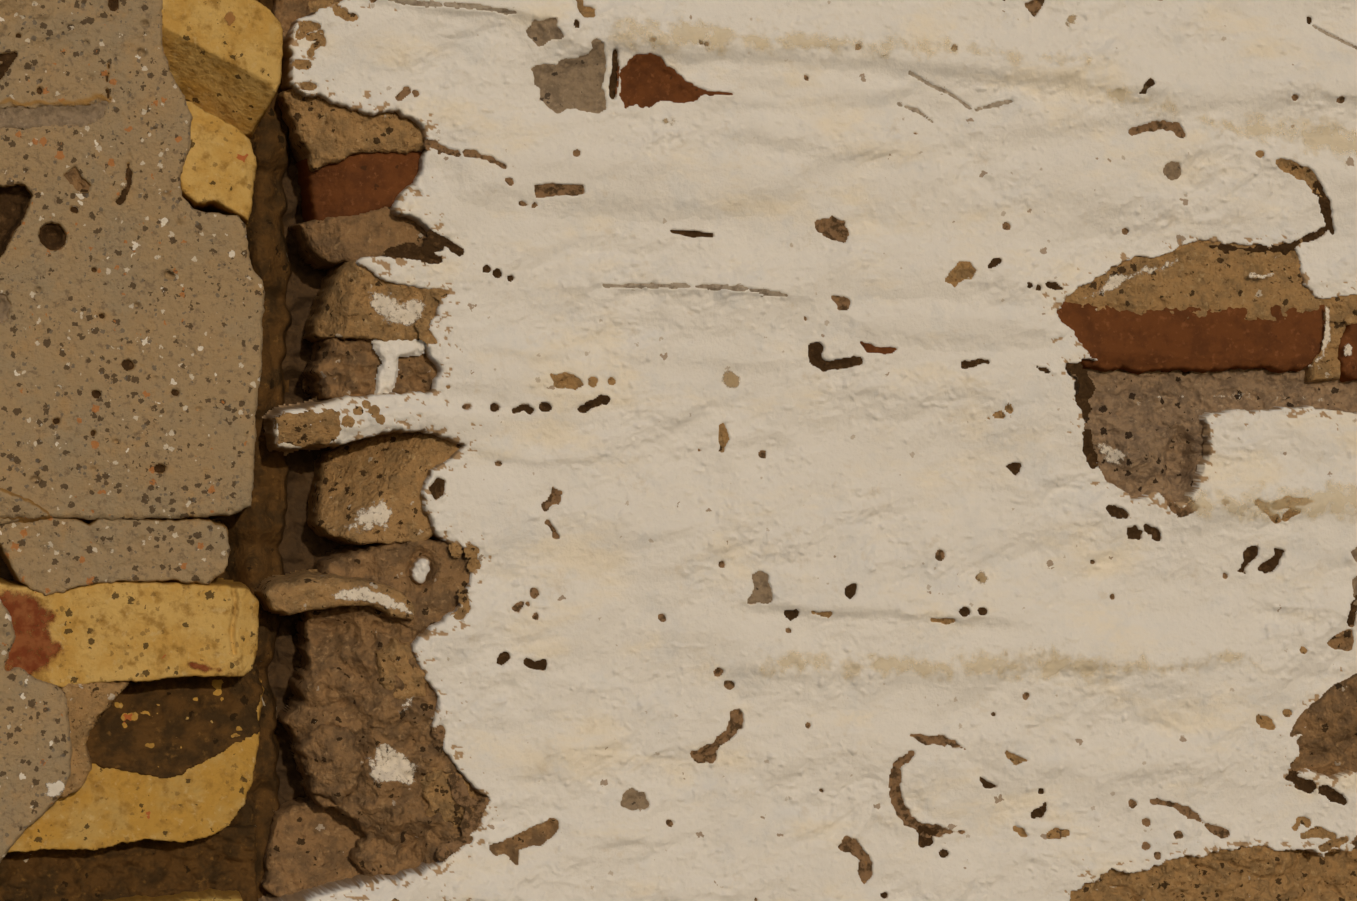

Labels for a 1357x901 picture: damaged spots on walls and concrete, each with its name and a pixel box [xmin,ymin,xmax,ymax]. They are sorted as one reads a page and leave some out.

peeling [526,0,595,47]
peeling [531,38,733,113]
peeling [961,358,990,369]
spalling [1027,238,1357,541]
spalling [0,0,514,901]
peeling [541,487,562,539]
peeling [512,588,539,620]
peeling [1327,547,1357,651]
peeling [497,652,547,670]
spalling [1256,673,1357,805]
crack [888,734,966,848]
spalling [1070,798,1357,901]